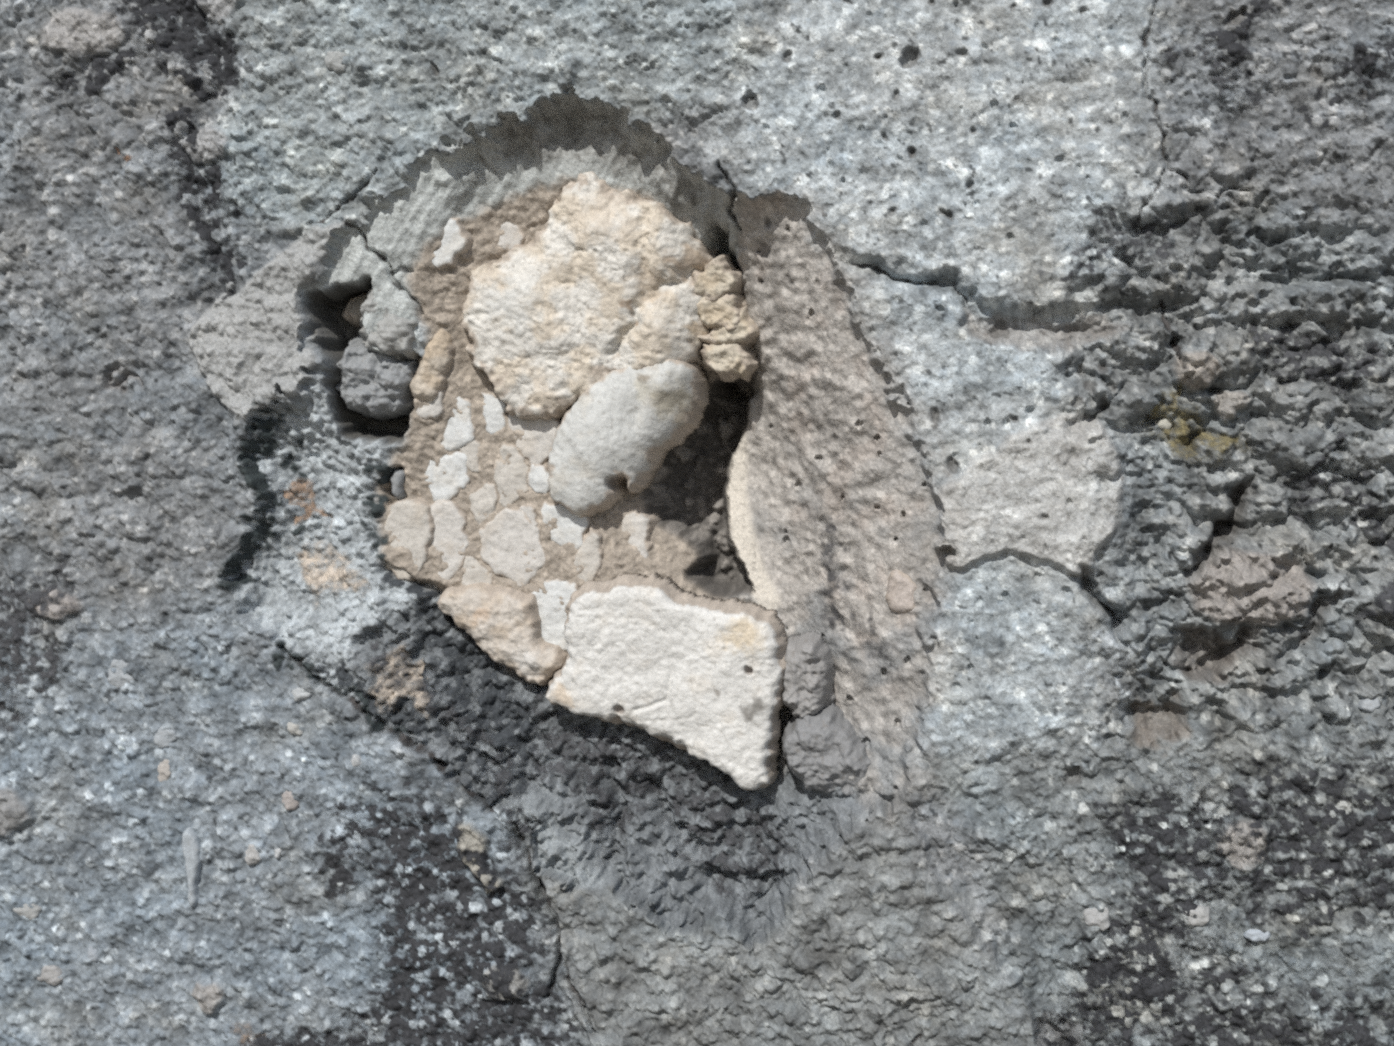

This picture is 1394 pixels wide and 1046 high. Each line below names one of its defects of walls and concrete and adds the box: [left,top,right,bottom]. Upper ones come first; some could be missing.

crack [1139,99,1187,218]
spalling [185,86,1127,1046]
crack [294,658,494,812]
crack [520,833,590,1021]